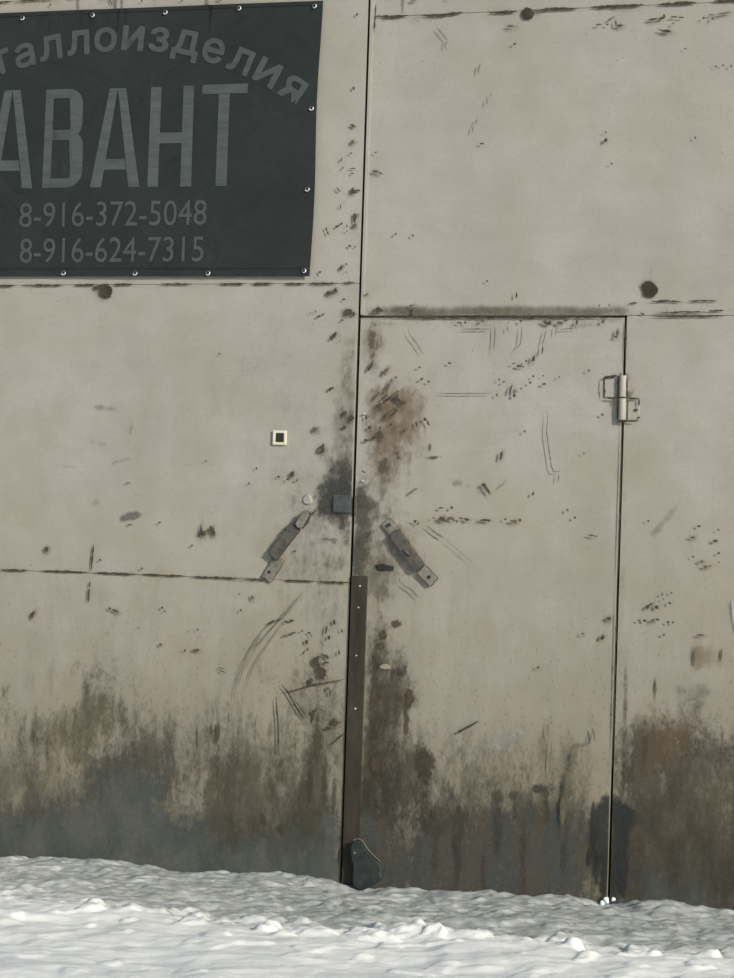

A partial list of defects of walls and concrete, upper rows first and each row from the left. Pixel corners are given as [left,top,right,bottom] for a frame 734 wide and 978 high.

rust [489,7,577,20]
rust [368,281,724,426]
rust [369,391,415,483]
leakage [0,726,341,882]
leakage [359,778,734,910]